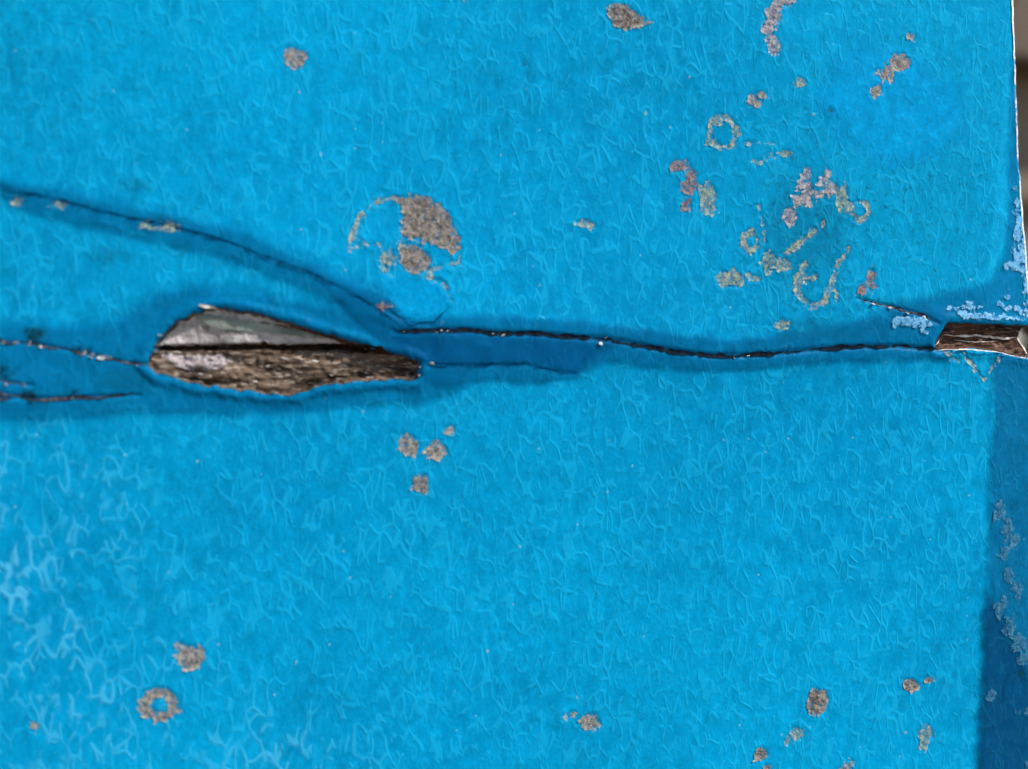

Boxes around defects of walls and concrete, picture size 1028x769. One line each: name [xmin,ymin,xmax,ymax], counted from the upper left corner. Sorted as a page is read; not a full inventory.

peeling [870,54,911,100]
peeling [669,159,716,217]
peeling [782,169,870,227]
peeling [348,193,461,289]
crack [1,186,938,359]
peeling [716,220,850,310]
crack [0,380,132,401]
crack [0,340,144,366]
spalling [148,304,421,396]
crack [424,362,575,375]
spalling [935,323,1028,382]
peeling [137,688,182,725]